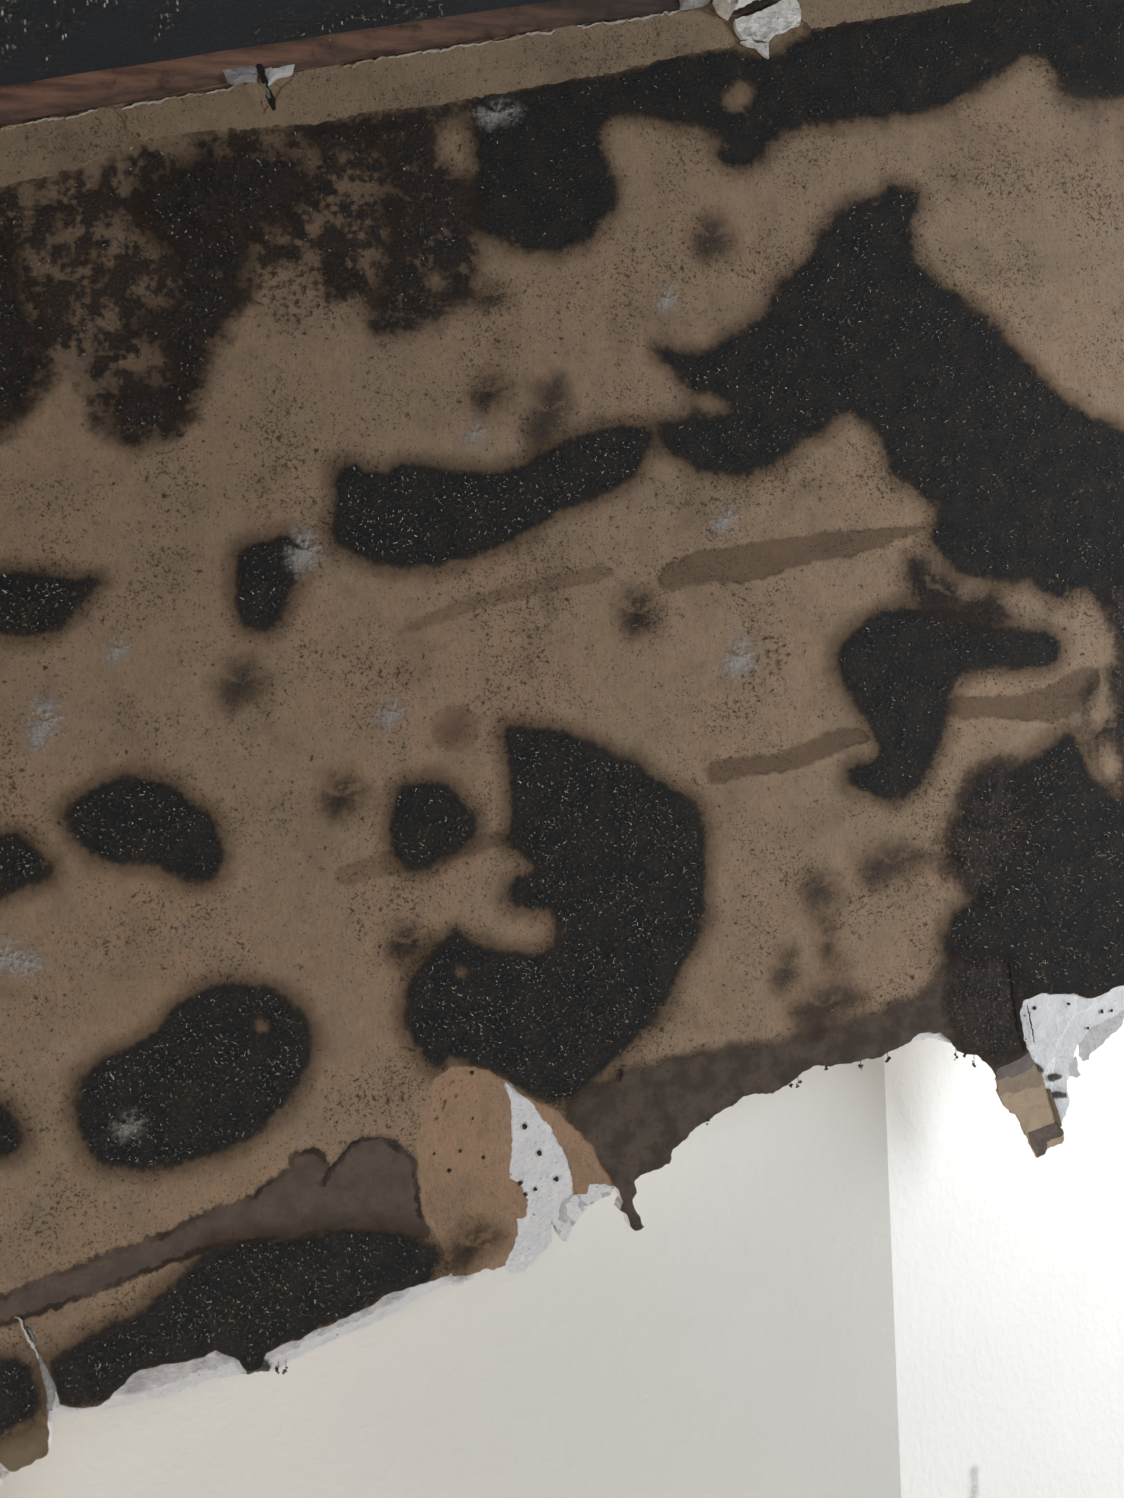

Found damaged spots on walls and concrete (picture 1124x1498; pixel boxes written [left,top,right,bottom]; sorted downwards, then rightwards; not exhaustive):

flaking render [679,0,710,10]
flaking render [733,0,801,59]
damp [0,0,1124,446]
damp [0,570,102,638]
damp [233,533,316,634]
damp [0,832,55,900]
damp [62,773,225,886]
damp [72,982,314,1173]
damp [0,1103,25,1160]
crack [14,1317,56,1411]